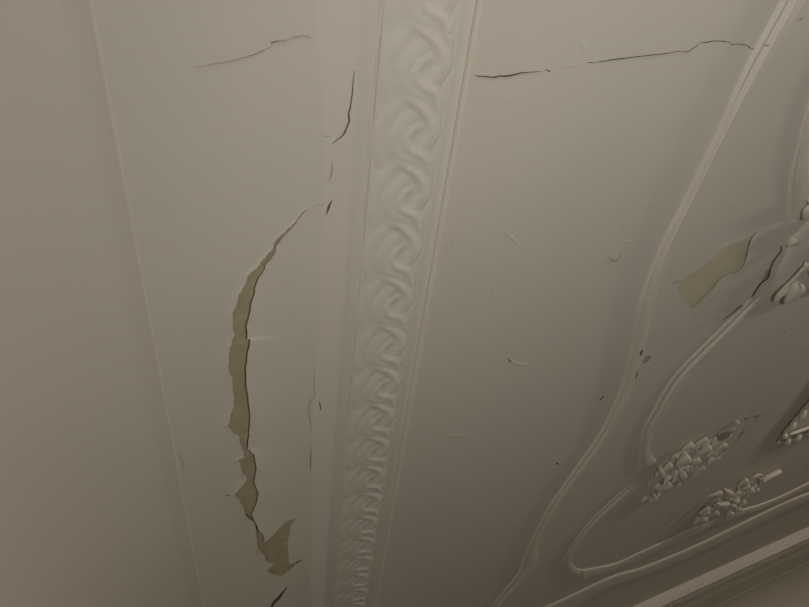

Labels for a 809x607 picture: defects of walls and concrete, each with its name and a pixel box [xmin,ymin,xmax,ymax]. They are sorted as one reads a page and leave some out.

crack [195,35,313,72]
crack [474,41,769,82]
crack [327,71,355,144]
crack [724,246,787,321]
peeling [216,204,326,583]